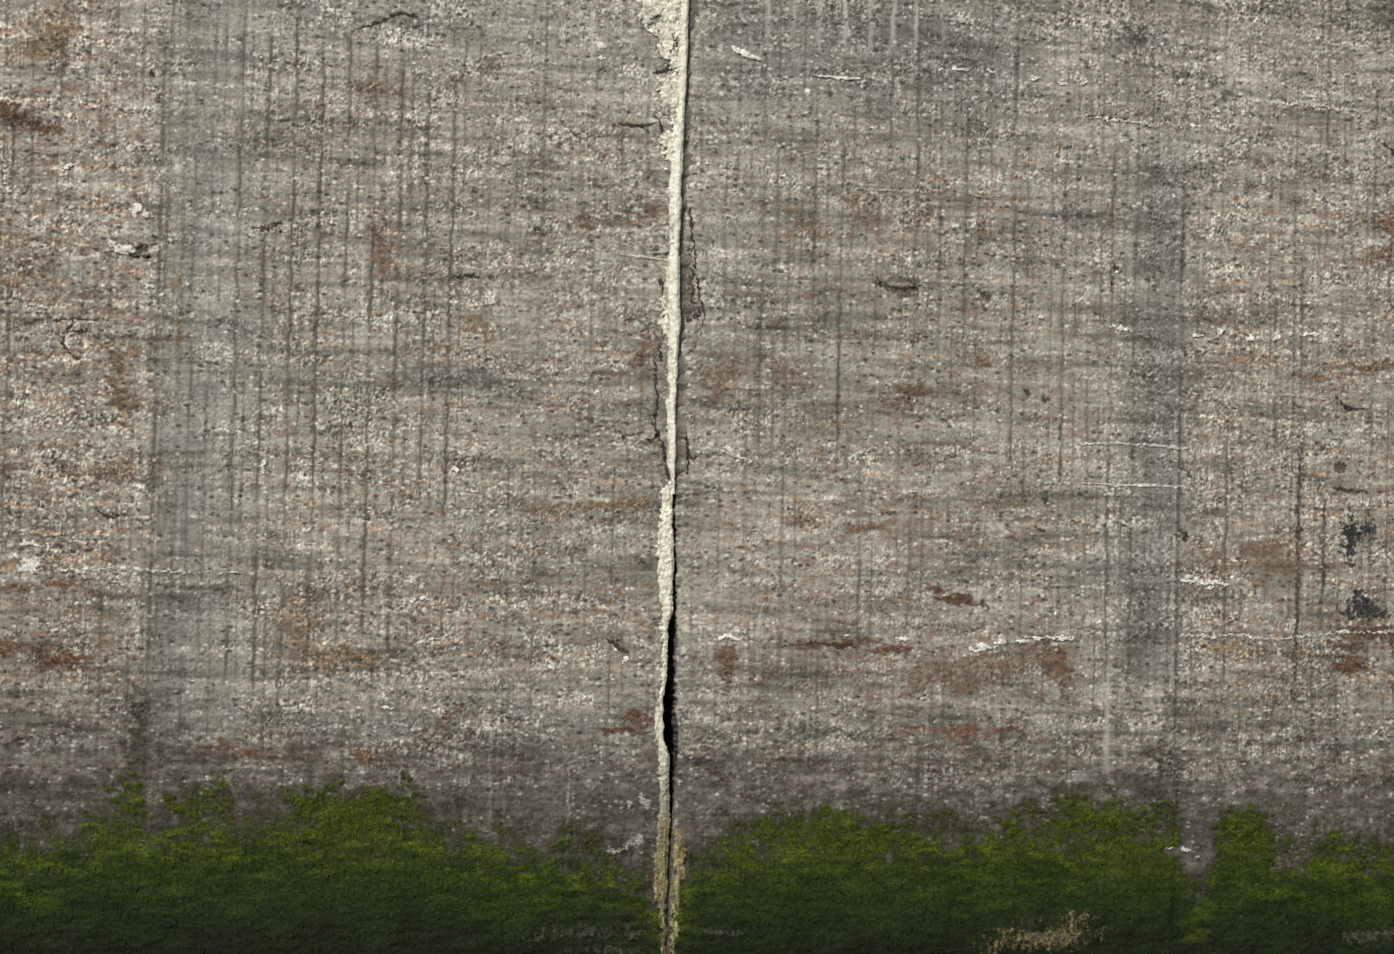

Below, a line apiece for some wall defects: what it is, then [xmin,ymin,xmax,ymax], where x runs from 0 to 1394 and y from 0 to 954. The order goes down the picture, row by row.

rust [0,101,62,135]
crack [619,117,667,160]
crack [653,36,678,74]
crack [658,196,705,335]
crack [621,345,700,482]
water stain [1180,442,1393,679]
rust [0,630,92,672]
water stain [607,814,687,954]